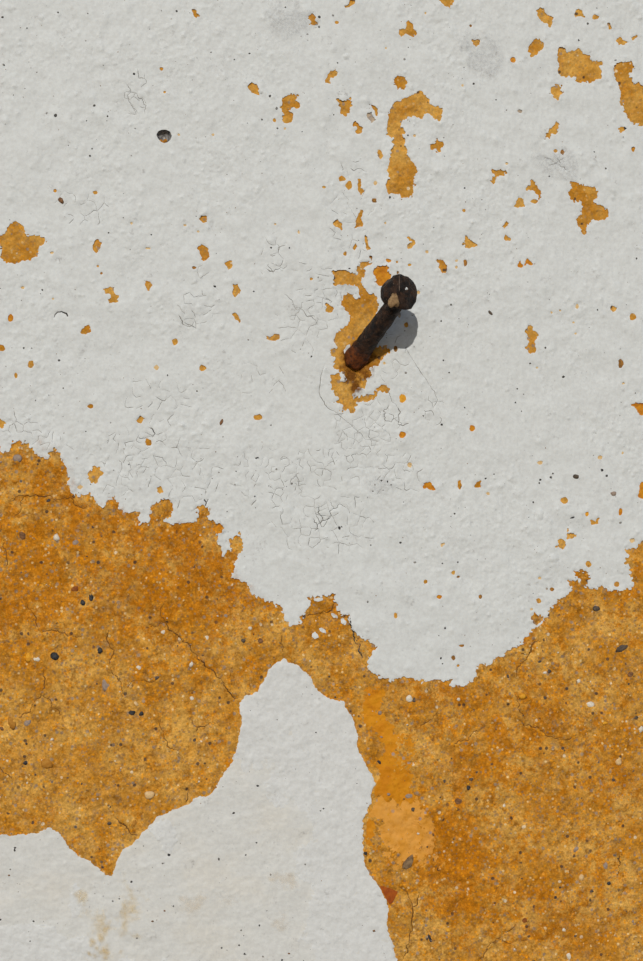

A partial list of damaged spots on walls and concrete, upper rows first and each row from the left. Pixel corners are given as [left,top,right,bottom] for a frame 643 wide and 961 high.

peeling [336,76,444,203]
peeling [549,47,643,133]
peeling [0,221,54,264]
peeling [568,181,608,235]
peeling [325,210,411,413]
crack [0,239,443,568]
peeling [0,440,643,961]